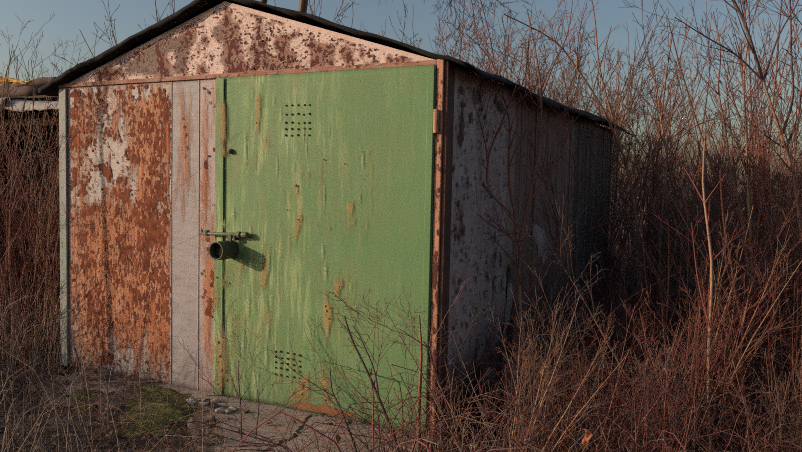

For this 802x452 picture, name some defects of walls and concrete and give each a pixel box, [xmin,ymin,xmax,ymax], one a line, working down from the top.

rust [68,83,190,384]
rust [193,87,226,391]
crack [221,415,311,452]